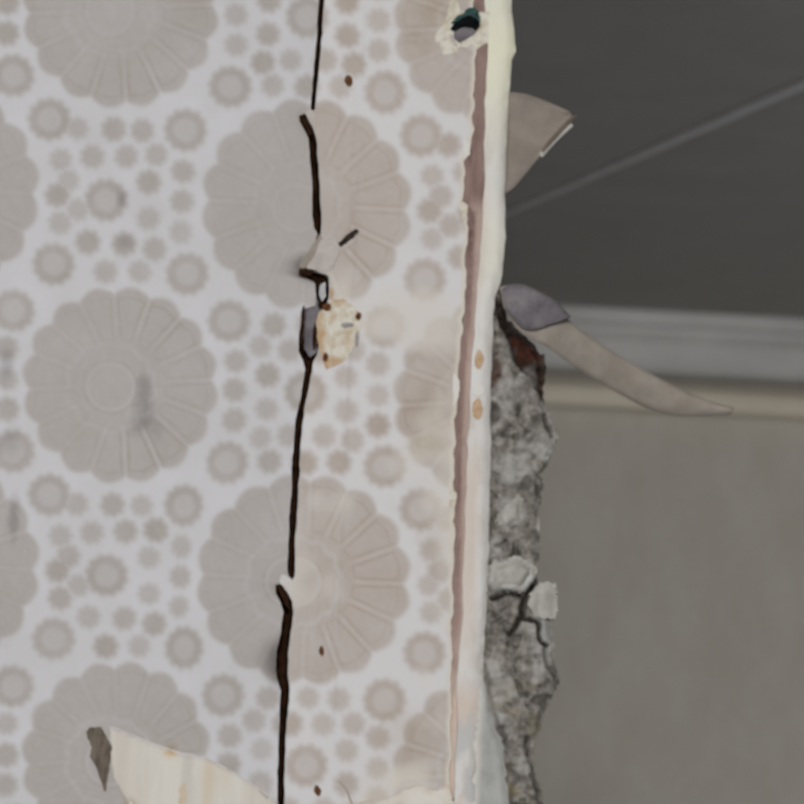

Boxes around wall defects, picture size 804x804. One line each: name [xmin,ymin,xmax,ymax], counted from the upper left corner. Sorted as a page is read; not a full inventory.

peeling [469,0,485,12]
crack [299,0,324,239]
spalling [299,234,340,276]
crack [338,229,359,254]
spalling [300,282,361,369]
spalling [449,44,560,804]
crack [276,267,329,804]